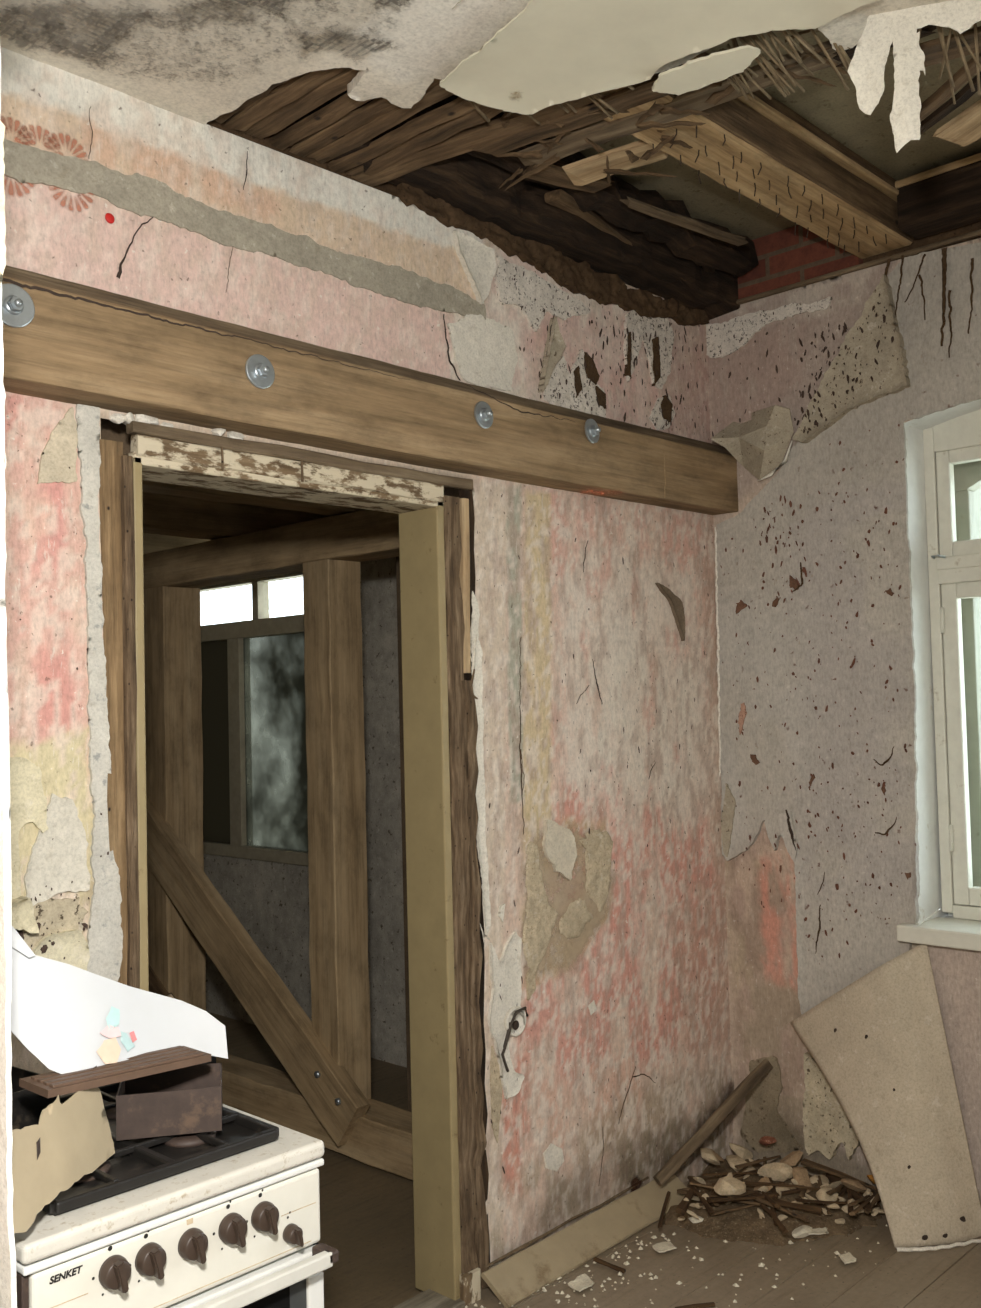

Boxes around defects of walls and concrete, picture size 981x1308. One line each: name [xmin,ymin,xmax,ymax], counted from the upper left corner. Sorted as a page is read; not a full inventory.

mould [0,0,410,83]
peeling [440,0,878,115]
crack [2,217,410,380]
flaking render [3,139,832,430]
flaking render [0,282,90,1308]
spalling [470,591,613,1099]